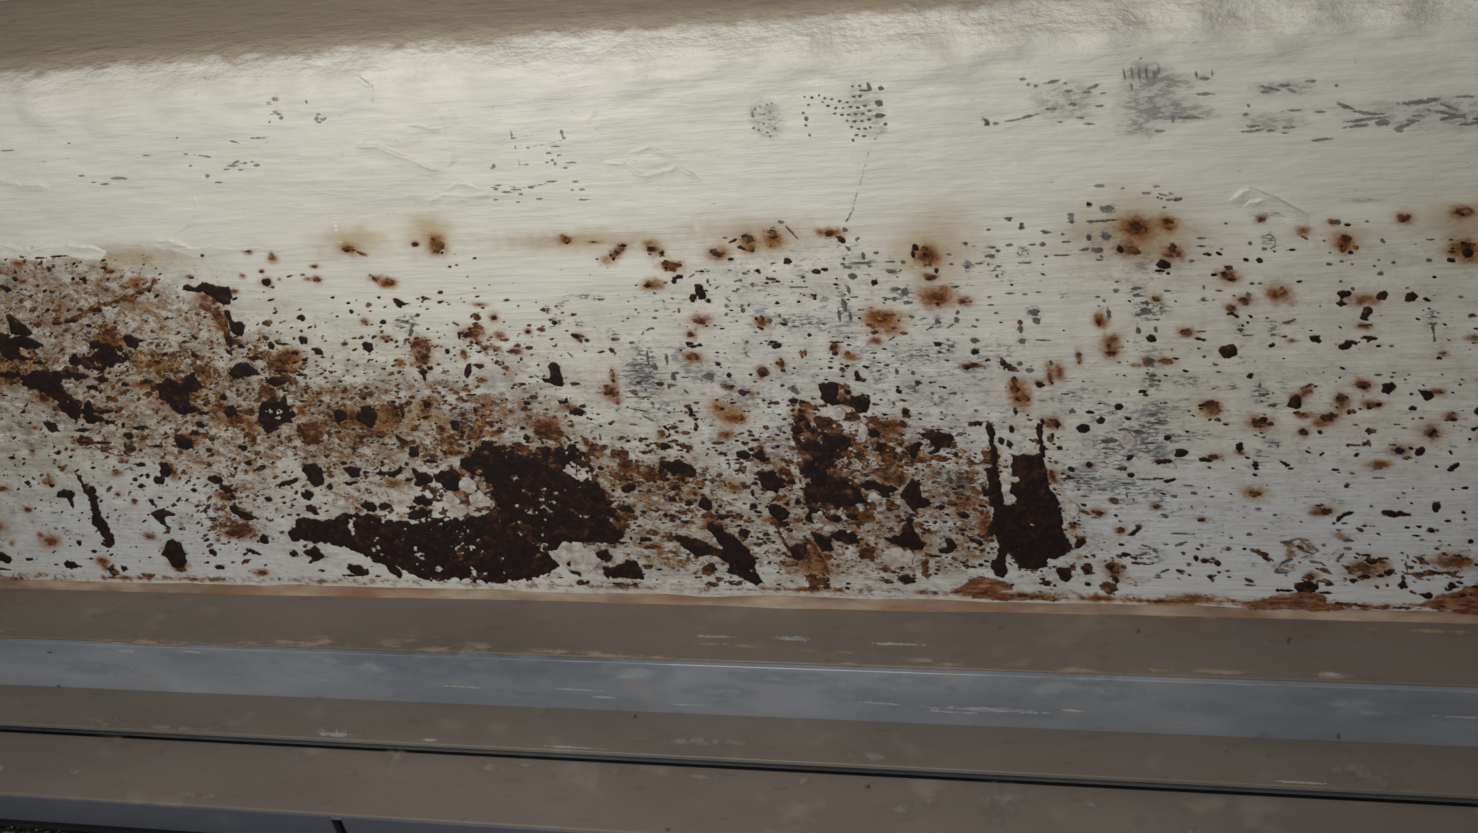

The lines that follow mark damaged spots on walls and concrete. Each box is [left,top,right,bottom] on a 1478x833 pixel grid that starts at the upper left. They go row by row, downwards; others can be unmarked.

corrosion [1450,206,1474,218]
corrosion [0,215,1478,615]
peeling [446,477,493,516]
peeling [543,541,609,586]